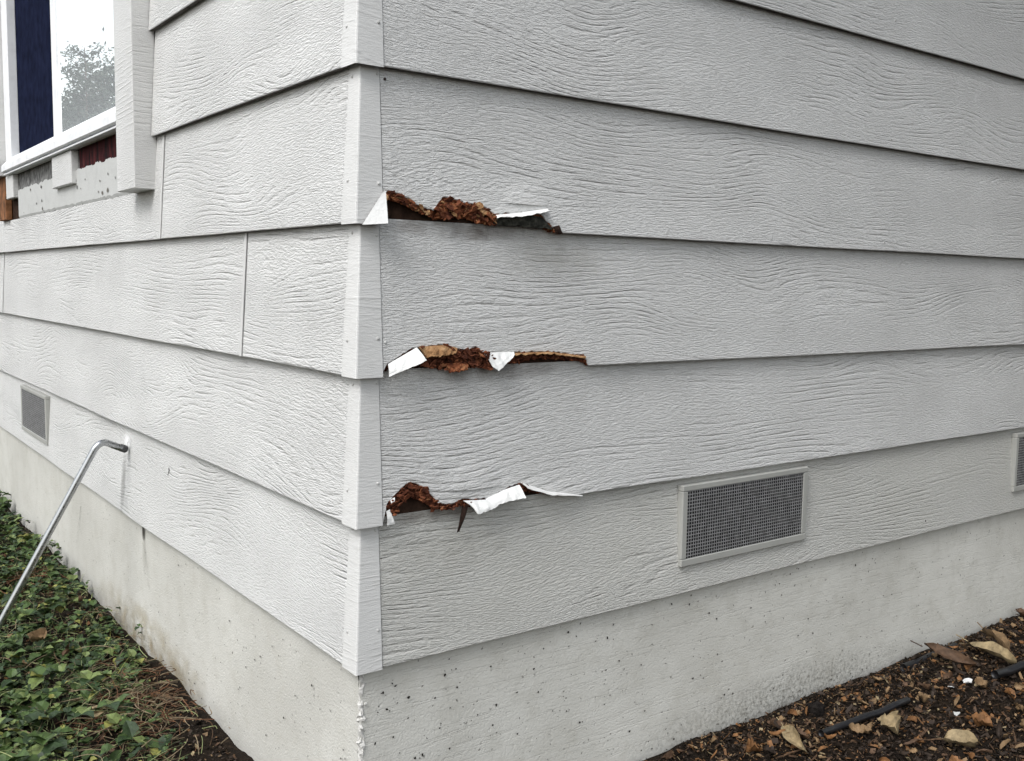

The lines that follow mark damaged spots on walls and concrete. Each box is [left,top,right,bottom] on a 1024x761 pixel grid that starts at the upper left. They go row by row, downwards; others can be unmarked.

peeling [496,209,549,218]
peeling [388,347,427,377]
peeling [485,352,515,371]
peeling [464,482,583,514]